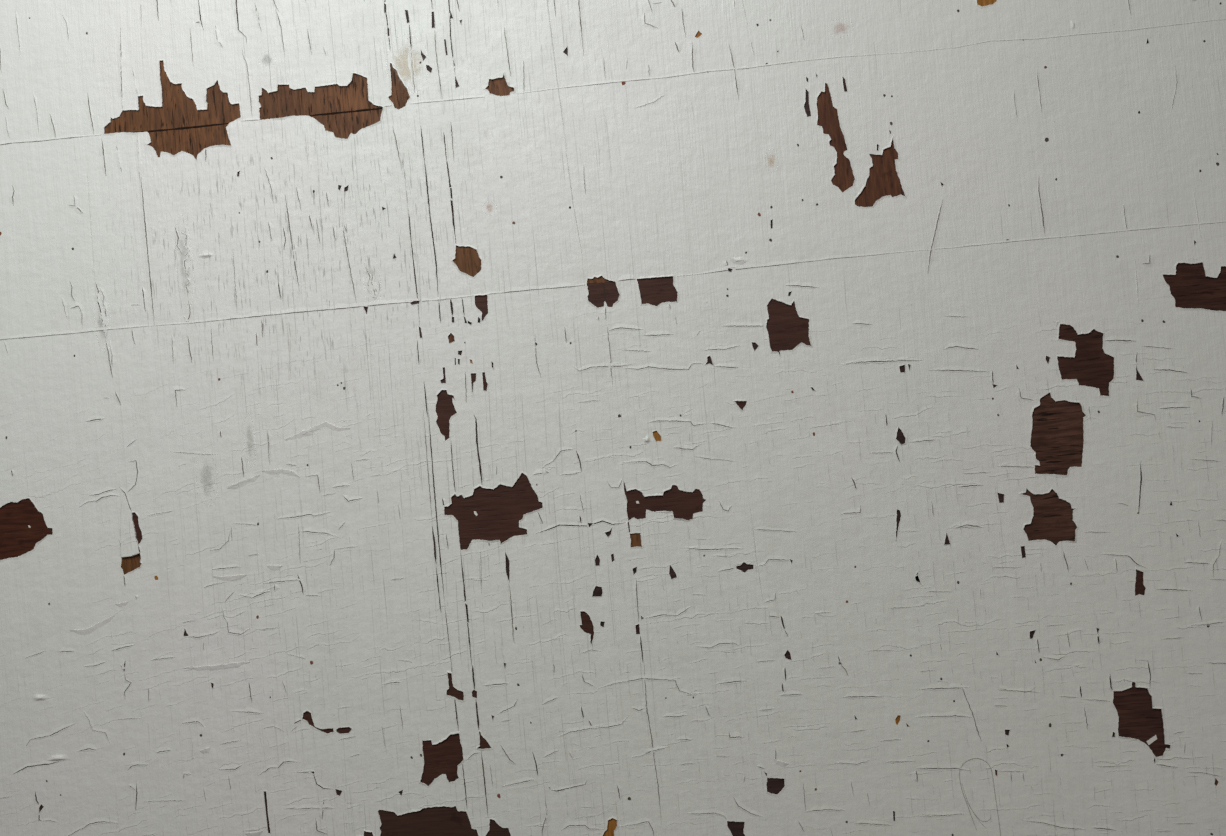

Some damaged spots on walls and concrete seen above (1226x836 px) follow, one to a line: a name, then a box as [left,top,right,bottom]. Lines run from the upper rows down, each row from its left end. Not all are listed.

peeling [103,59,243,161]
peeling [257,62,419,141]
crack [504,0,1226,112]
crack [533,176,1226,403]
crack [0,0,803,836]
peeling [997,322,1117,559]
crack [1105,335,1226,463]
peeling [0,496,54,562]
peeling [442,471,545,584]
crack [887,461,1226,687]
crack [798,643,1117,836]
peeling [356,804,512,836]